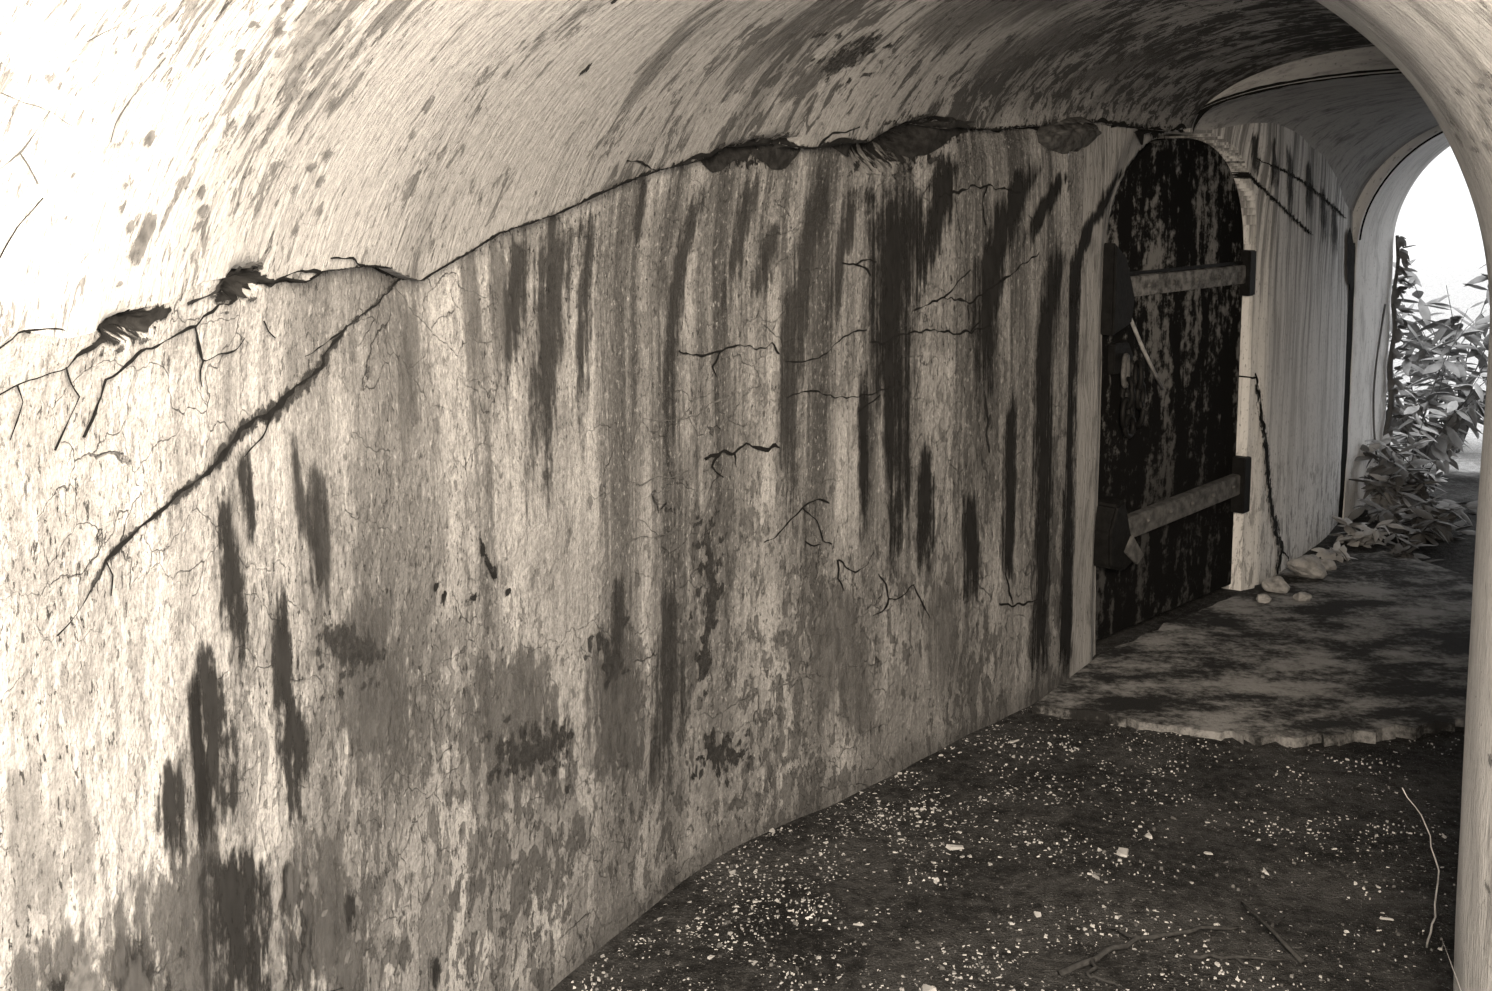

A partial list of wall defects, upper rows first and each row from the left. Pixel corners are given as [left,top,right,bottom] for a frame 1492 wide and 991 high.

crack [0,93,75,258]
crack [110,57,166,142]
spalling [92,262,307,357]
crack [0,123,1051,636]
leakage [462,210,595,515]
spalling [701,132,807,173]
leakage [721,154,979,685]
spalling [831,112,974,180]
leakage [972,162,1067,410]
leakage [1002,166,1129,676]
crack [1092,68,1403,145]
leakage [14,434,373,991]